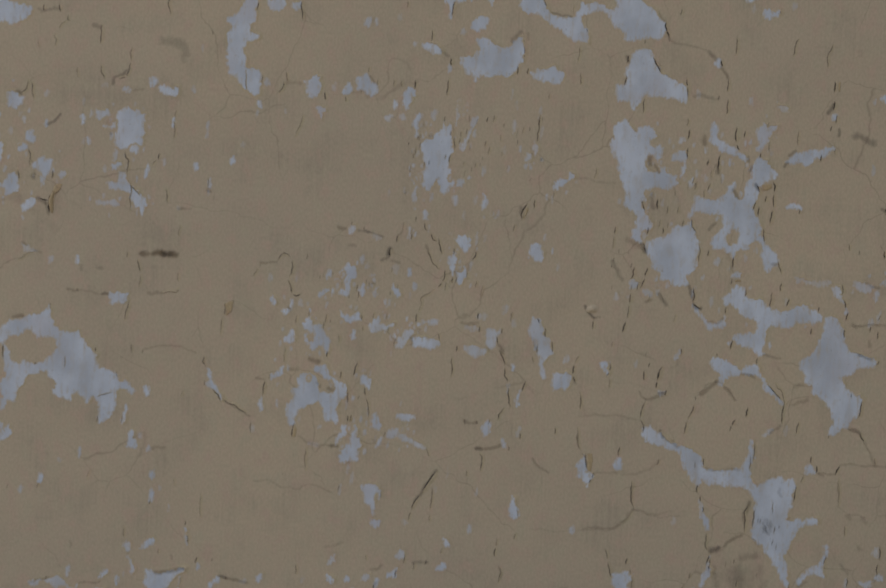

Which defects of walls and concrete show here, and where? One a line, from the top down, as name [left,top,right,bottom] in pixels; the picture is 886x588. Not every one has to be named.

peeling [223,0,306,119]
peeling [382,0,568,208]
crack [712,38,740,115]
crack [827,44,841,132]
crack [389,206,449,321]
crack [611,226,661,347]
peeling [517,0,881,439]
peeling [0,302,153,454]
crack [180,356,256,434]
peeling [255,292,443,532]
crack [640,366,670,425]
peeling [639,423,832,588]